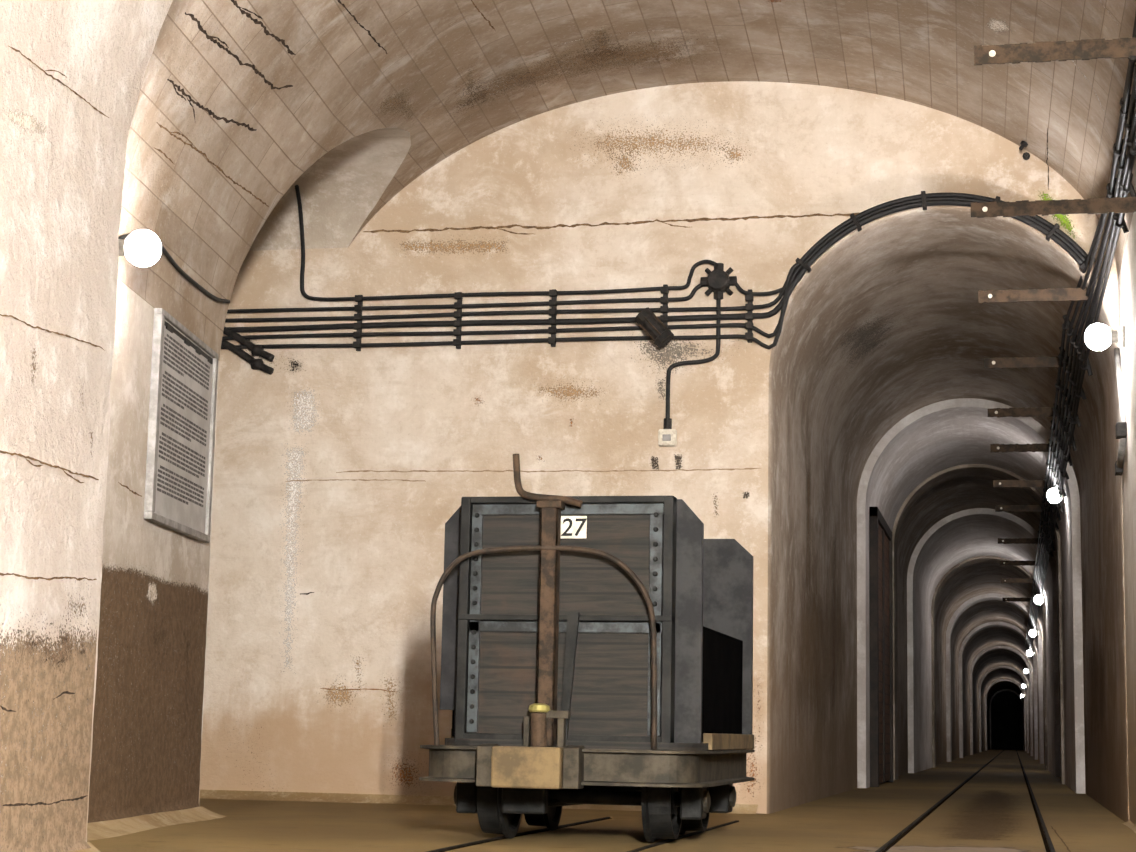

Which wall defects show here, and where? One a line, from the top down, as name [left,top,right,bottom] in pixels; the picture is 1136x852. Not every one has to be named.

crack [9,46,109,118]
crack [185,12,293,89]
crack [231,0,296,55]
crack [337,0,387,54]
crack [155,79,269,207]
crack [363,213,859,235]
damp [0,564,208,852]